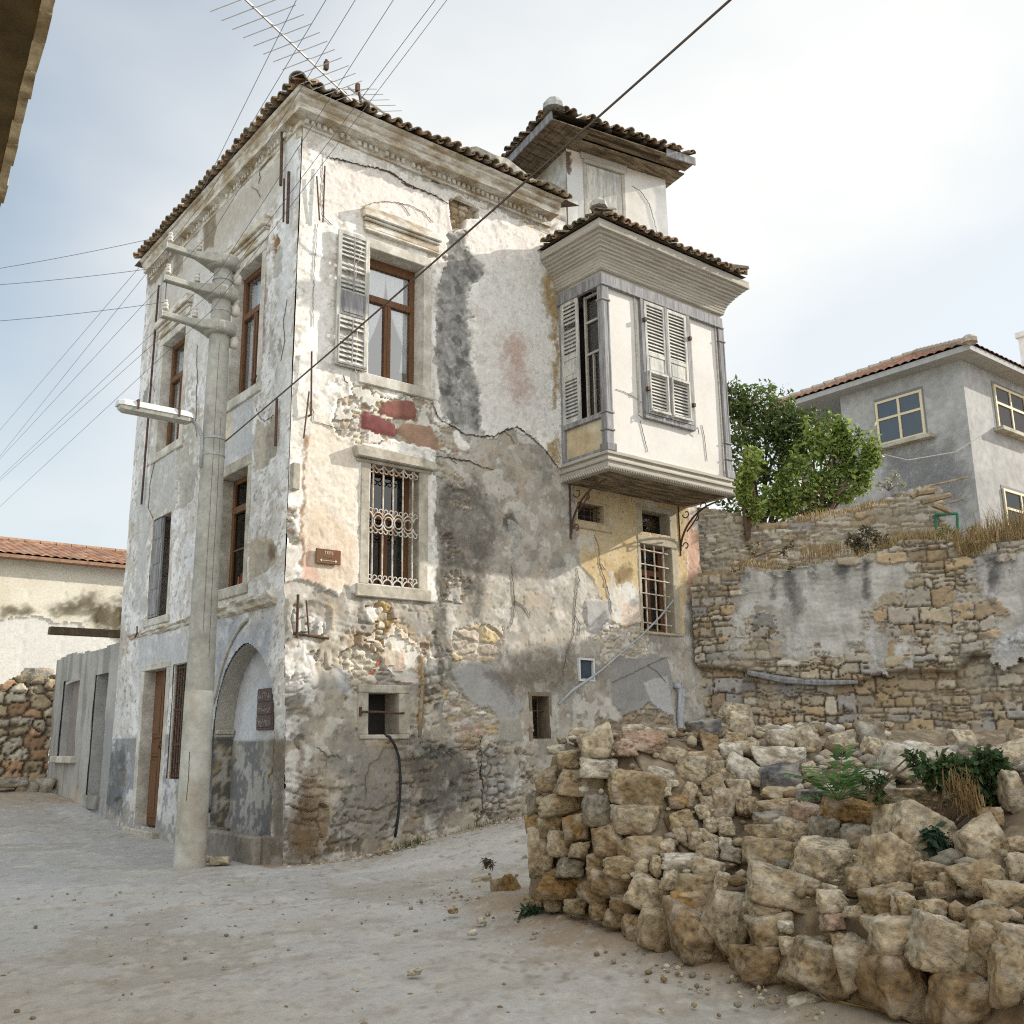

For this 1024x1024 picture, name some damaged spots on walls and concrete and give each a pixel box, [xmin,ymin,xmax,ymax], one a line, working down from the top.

crack [312,156,448,327]
spalling [331,383,470,487]
crack [432,403,562,471]
leakage [4,606,32,616]
leakage [52,595,122,630]
spalling [291,600,333,636]
spalling [338,601,422,694]
spalling [445,623,505,662]
peeling [931,544,1024,671]